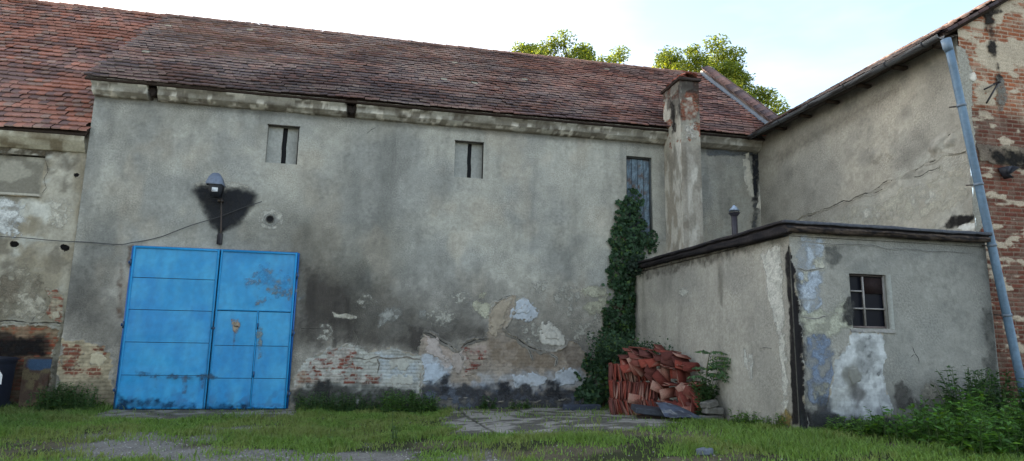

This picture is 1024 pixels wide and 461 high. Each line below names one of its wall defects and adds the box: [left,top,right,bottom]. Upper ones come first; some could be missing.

crack [796,132,965,220]
peeling [957,222,976,231]
spalling [0,267,117,408]
water stain [286,375,582,410]
spalling [289,286,608,407]
spalling [760,236,894,428]